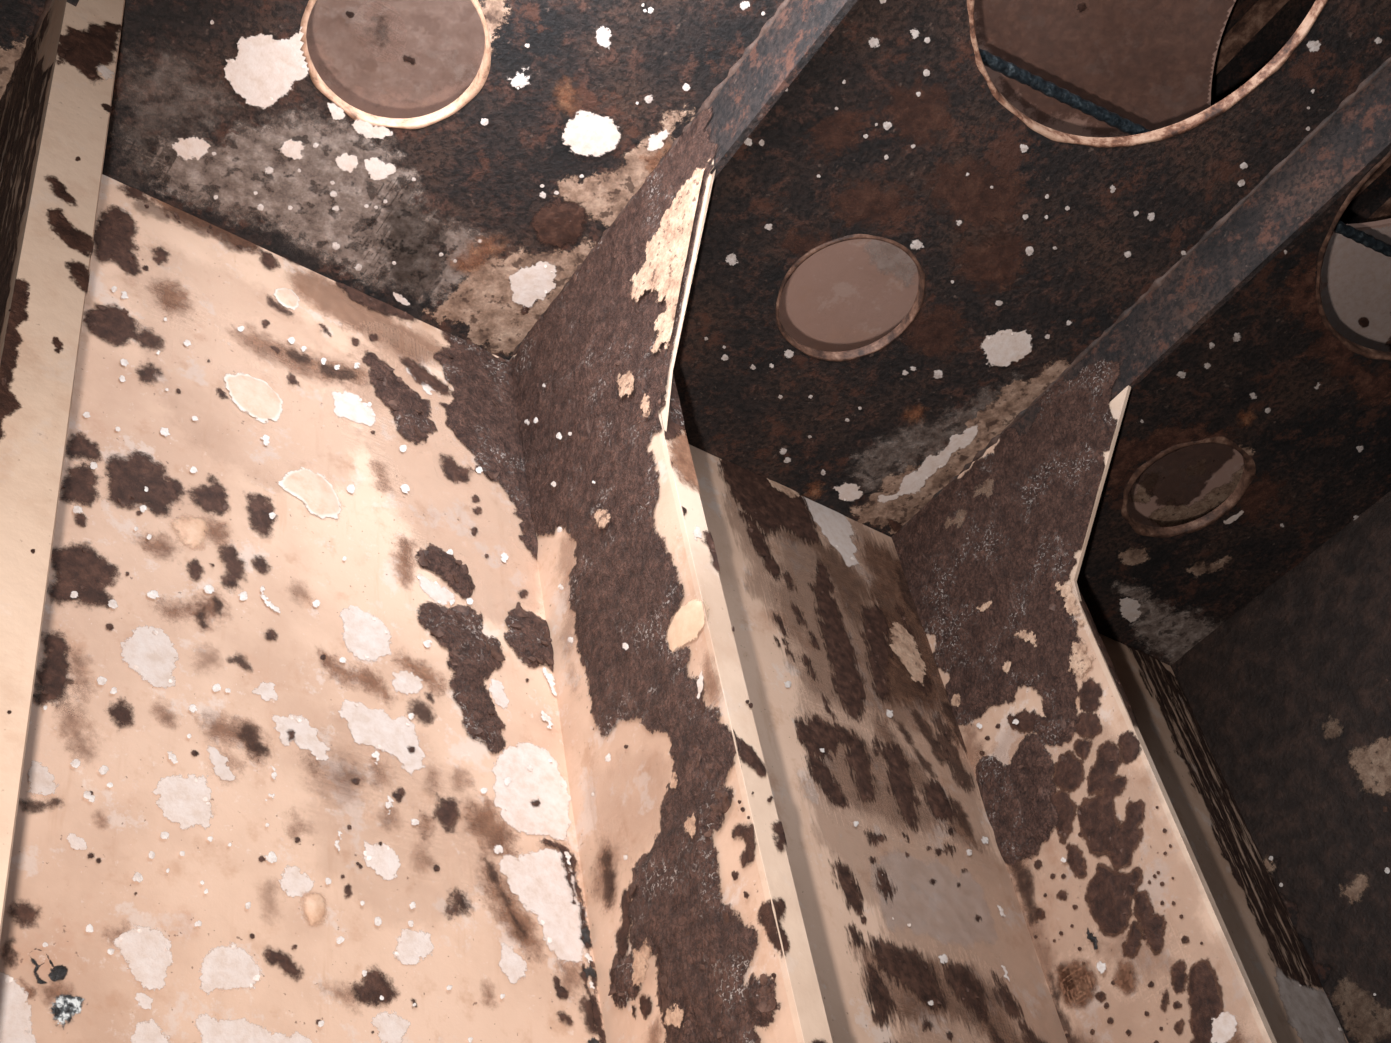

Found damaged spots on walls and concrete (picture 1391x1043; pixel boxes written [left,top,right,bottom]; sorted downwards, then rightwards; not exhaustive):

peeling [224,26,309,109]
peeling [562,110,621,157]
peeling [509,261,557,308]
peeling [980,329,1050,367]
rust [0,10,790,1043]
peeling [338,699,426,777]
rust [719,359,1254,1043]
rust [1127,491,1391,1043]
peeling [194,1013,324,1043]